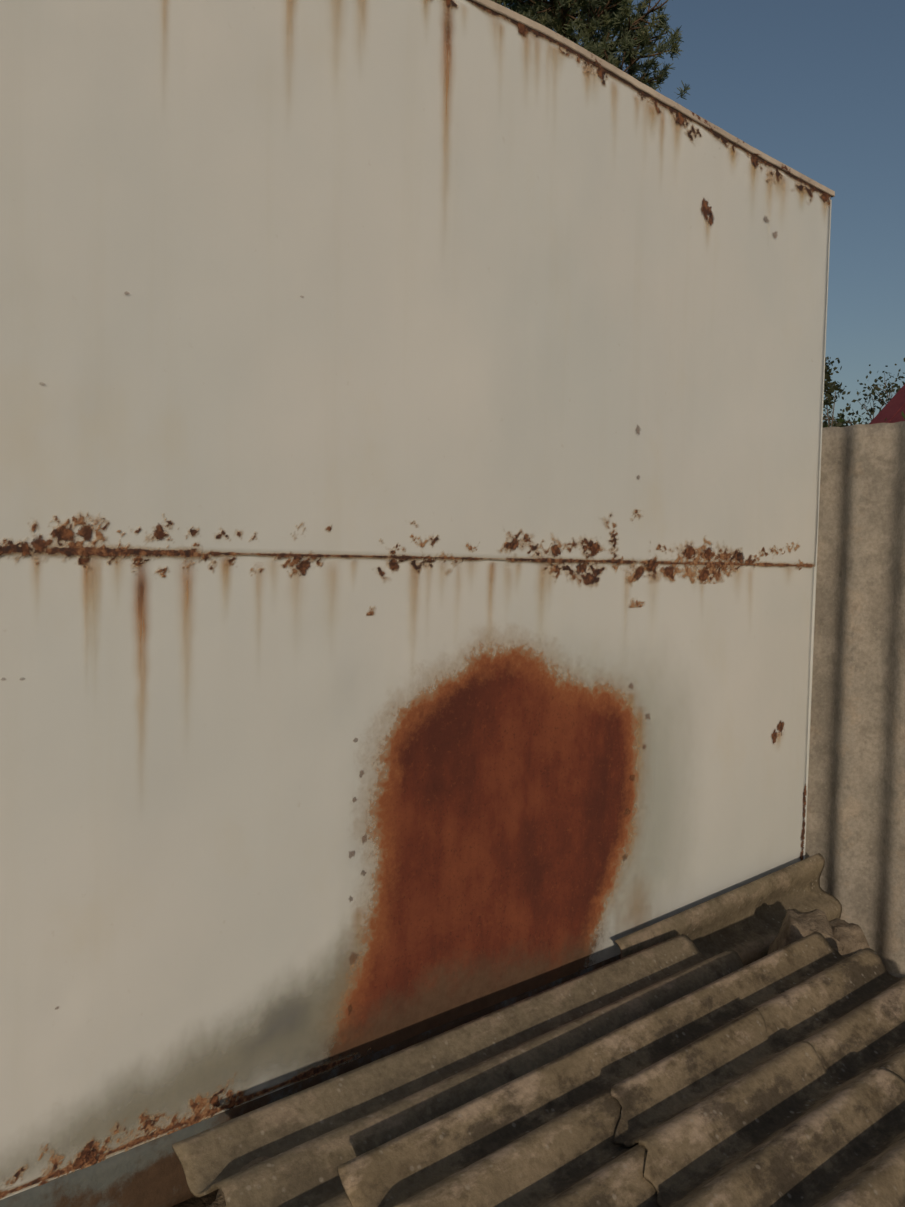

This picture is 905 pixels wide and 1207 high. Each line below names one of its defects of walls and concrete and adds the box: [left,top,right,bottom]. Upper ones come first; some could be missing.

corrosion [444,0,831,205]
corrosion [701,198,714,225]
corrosion [0,514,814,653]
corrosion [772,721,784,743]
corrosion [0,642,643,1198]